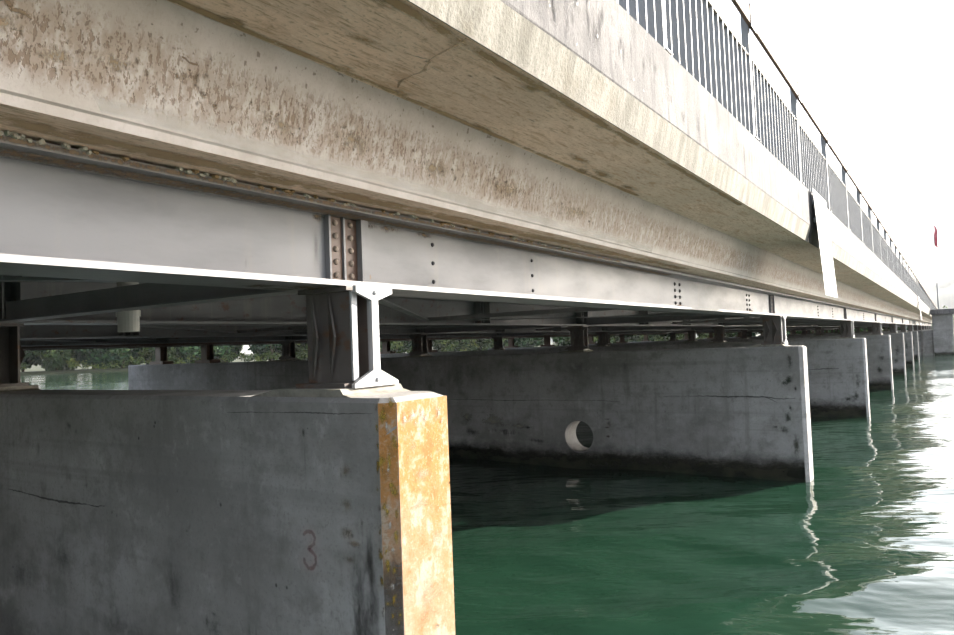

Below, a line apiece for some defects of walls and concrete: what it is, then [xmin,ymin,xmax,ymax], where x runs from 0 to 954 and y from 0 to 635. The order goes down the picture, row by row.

crack [397,38,466,88]
crack [696,394,795,402]
crack [10,489,102,507]
corrosion [397,396,455,635]